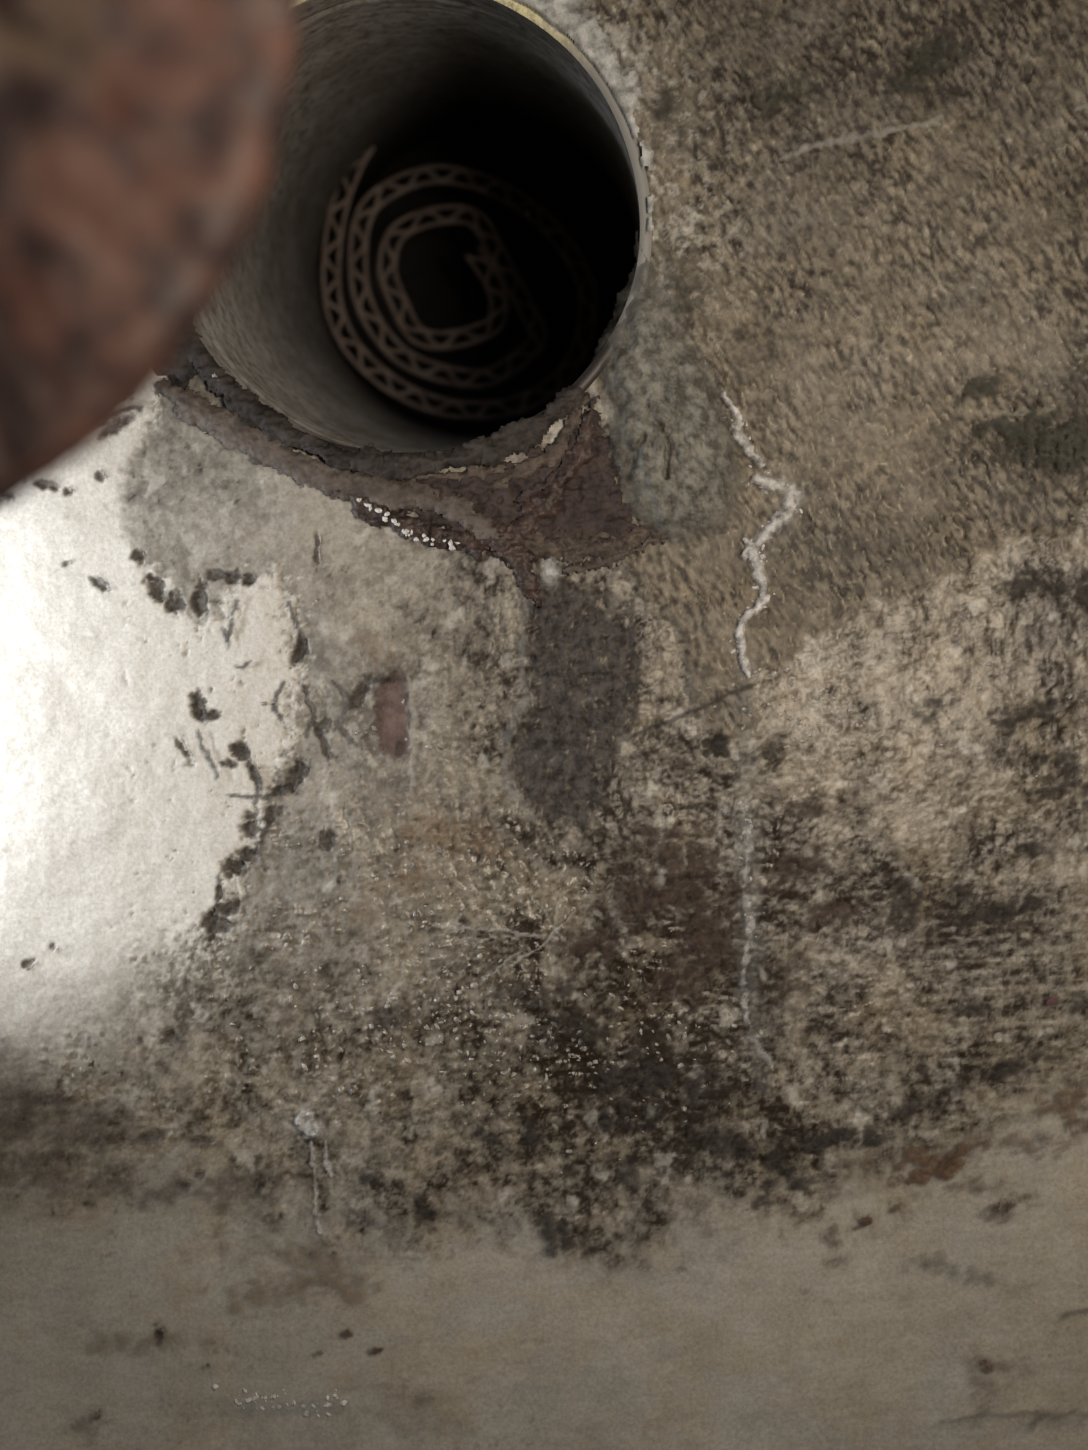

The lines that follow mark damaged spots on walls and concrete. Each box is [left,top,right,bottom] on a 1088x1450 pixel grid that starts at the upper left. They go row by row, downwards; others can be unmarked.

mould [996,567,1088,615]
mould [916,698,942,722]
mould [990,691,1072,733]
mould [1028,753,1088,803]
leakage [1018,841,1051,856]
leakage [892,875,924,931]
leakage [941,885,1049,935]
leakage [439,823,747,1050]
mould [981,1050,1067,1082]
mould [589,1049,965,1210]
efflorescence [295,1110,332,1233]
mould [539,1212,595,1257]